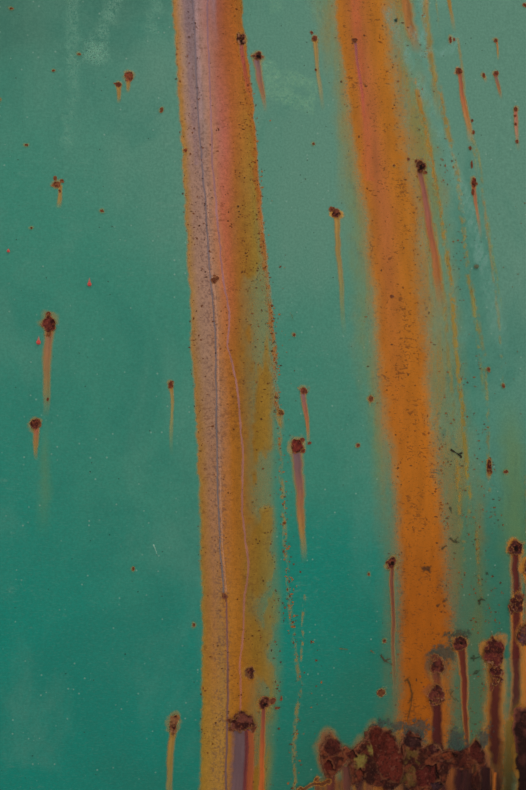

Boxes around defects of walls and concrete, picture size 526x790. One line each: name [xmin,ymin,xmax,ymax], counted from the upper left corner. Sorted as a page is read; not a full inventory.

corrosion [51,176,64,204]
corrosion [40,311,57,401]
corrosion [172,0,526,790]
corrosion [28,417,42,454]
corrosion [166,712,180,790]